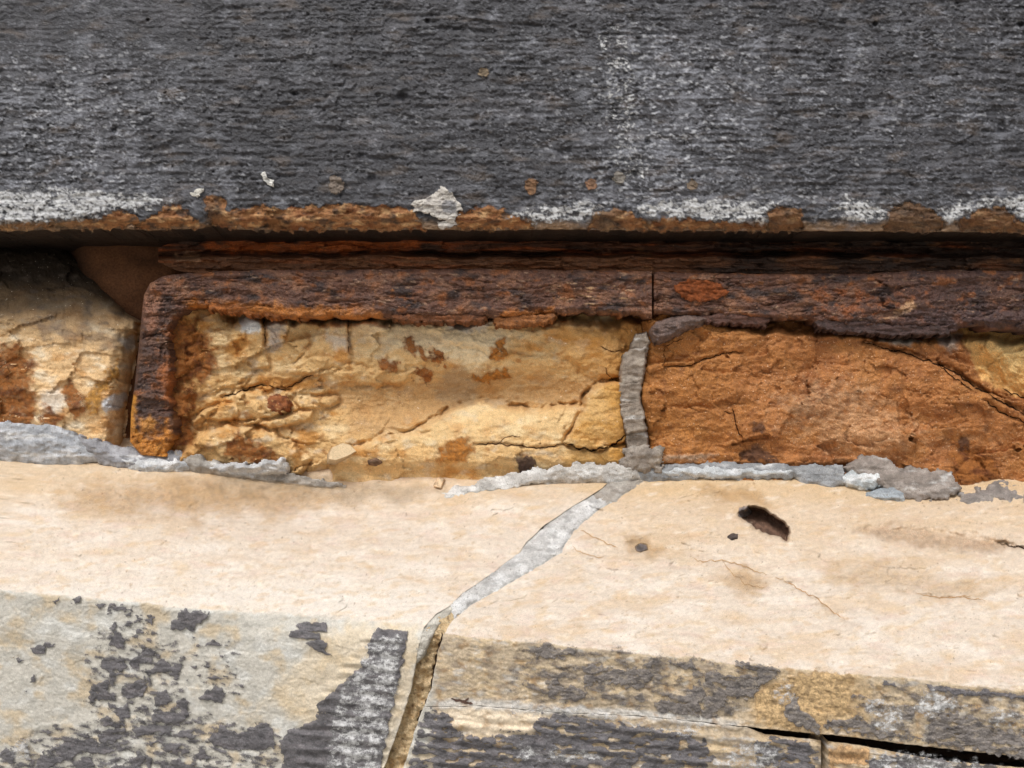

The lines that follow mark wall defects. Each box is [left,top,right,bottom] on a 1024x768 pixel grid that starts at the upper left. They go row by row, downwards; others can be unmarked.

damp [0,185,173,224]
damp [510,200,603,224]
damp [637,197,778,225]
corrosion [648,278,771,346]
corrosion [392,313,558,385]
corrosion [0,343,120,425]
crack [573,530,618,558]
spalling [738,506,789,541]
peeling [0,603,408,768]
crack [417,633,473,721]
peeling [408,642,1024,768]
crack [758,730,1024,763]